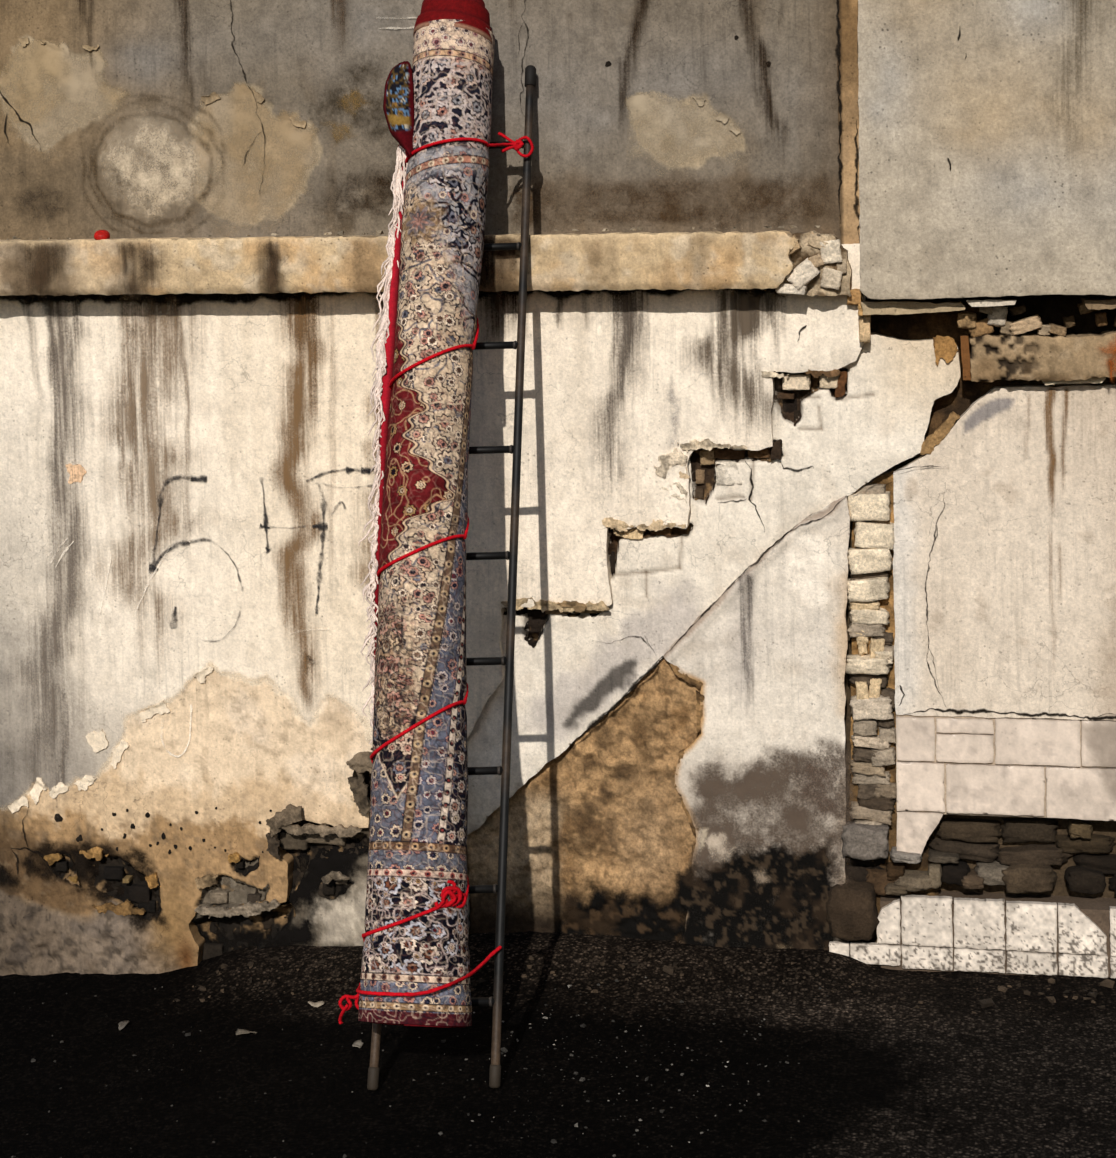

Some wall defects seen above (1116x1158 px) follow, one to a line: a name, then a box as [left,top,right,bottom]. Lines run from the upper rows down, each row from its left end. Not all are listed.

crack [0,92,41,150]
crack [230,0,265,196]
water stain [352,171,395,209]
water stain [622,0,647,103]
water stain [0,241,387,784]
flaking render [654,438,782,503]
flaking render [757,368,848,426]
spalling [871,294,1116,457]
crack [571,461,946,745]
crack [899,498,1116,721]
flaking render [467,656,705,934]
water stain [692,741,852,887]